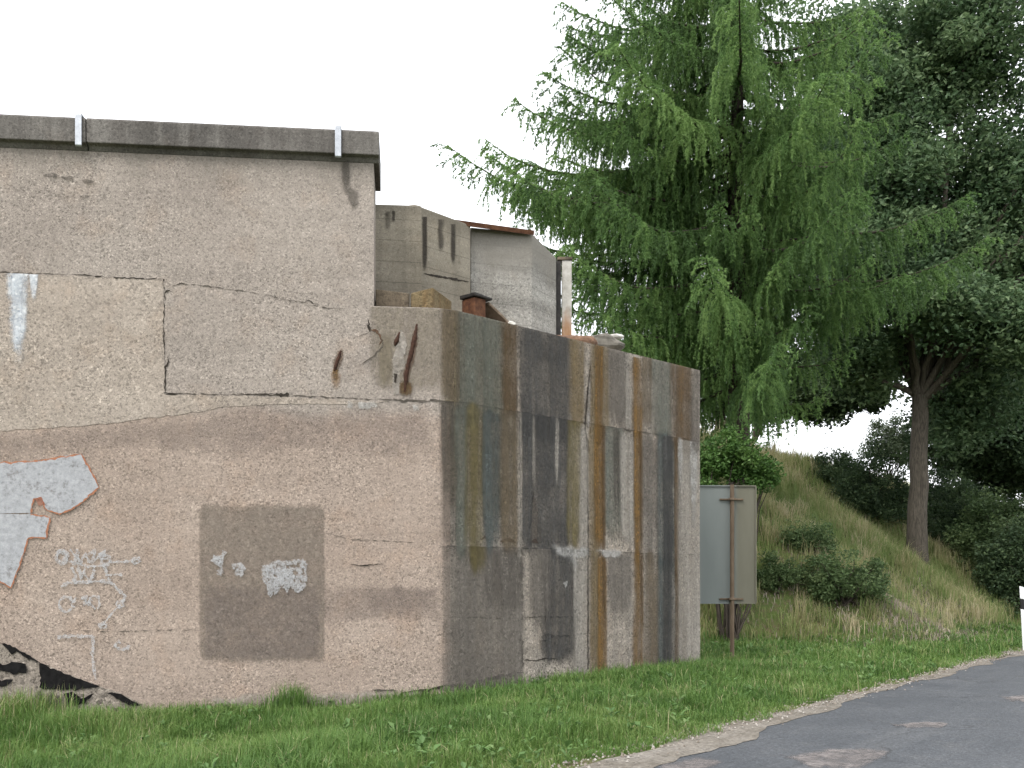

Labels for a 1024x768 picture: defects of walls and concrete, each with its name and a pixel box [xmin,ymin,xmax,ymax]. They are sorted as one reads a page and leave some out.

leakage [343,162,358,206]
leakage [8,273,38,348]
crack [0,271,344,395]
crack [241,390,289,398]
crack [356,319,383,364]
spalling [392,324,418,395]
leakage [408,308,587,691]
corrosion [568,339,608,672]
corrosion [633,357,643,667]
leakage [603,349,700,668]
peeling [0,643,140,711]